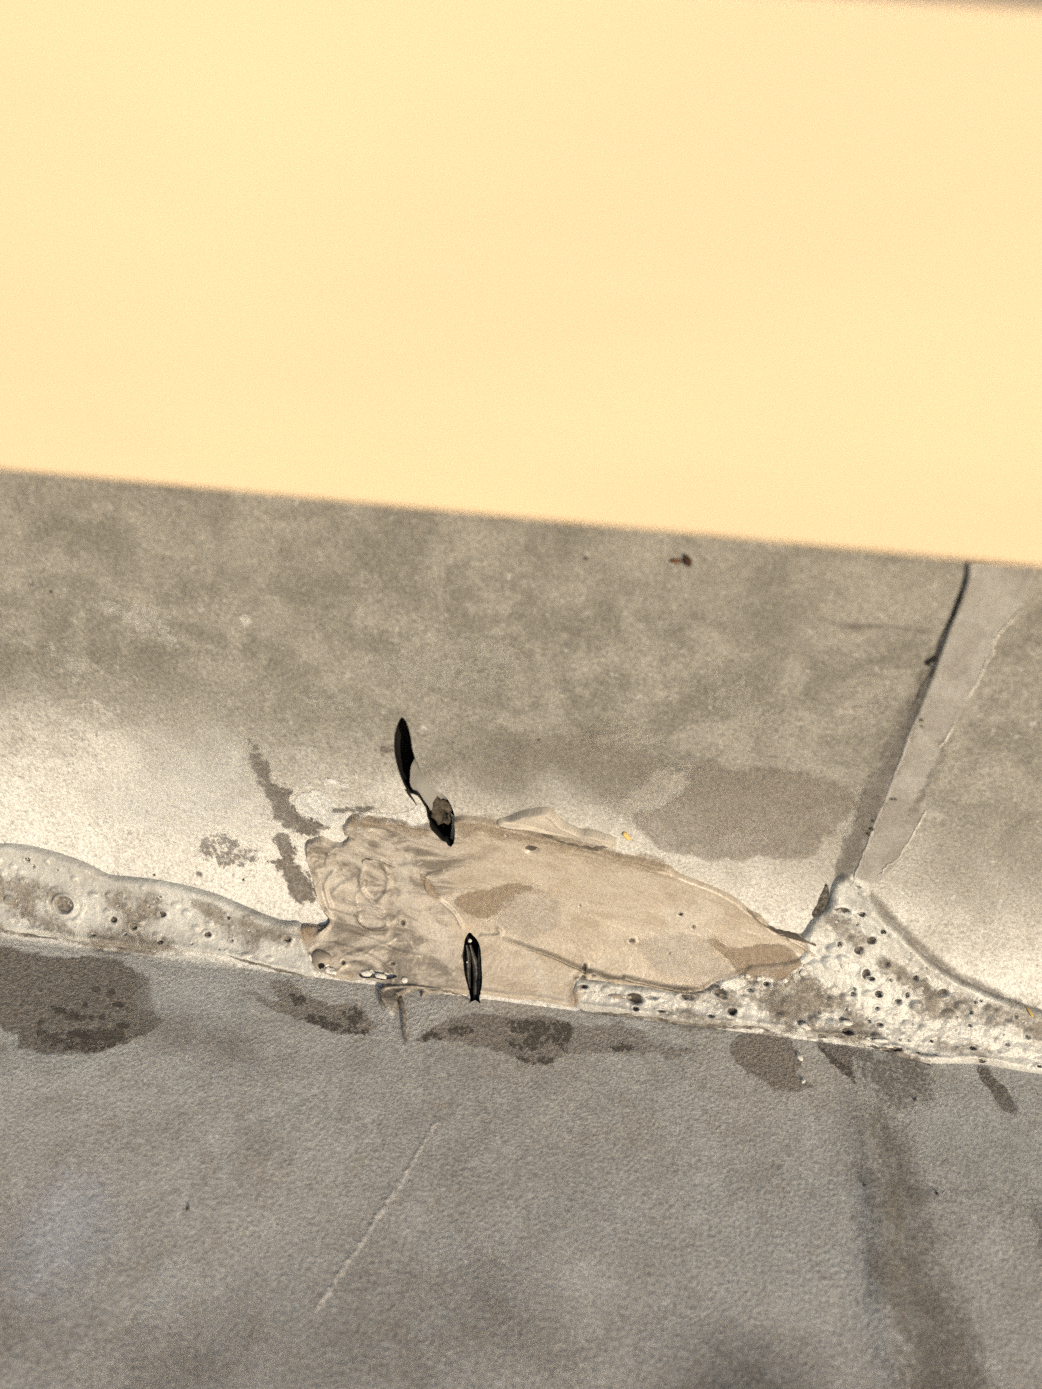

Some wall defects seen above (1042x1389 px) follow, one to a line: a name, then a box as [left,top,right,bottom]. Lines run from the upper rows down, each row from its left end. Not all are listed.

crack [909,573,966,711]
crack [812,884,829,917]